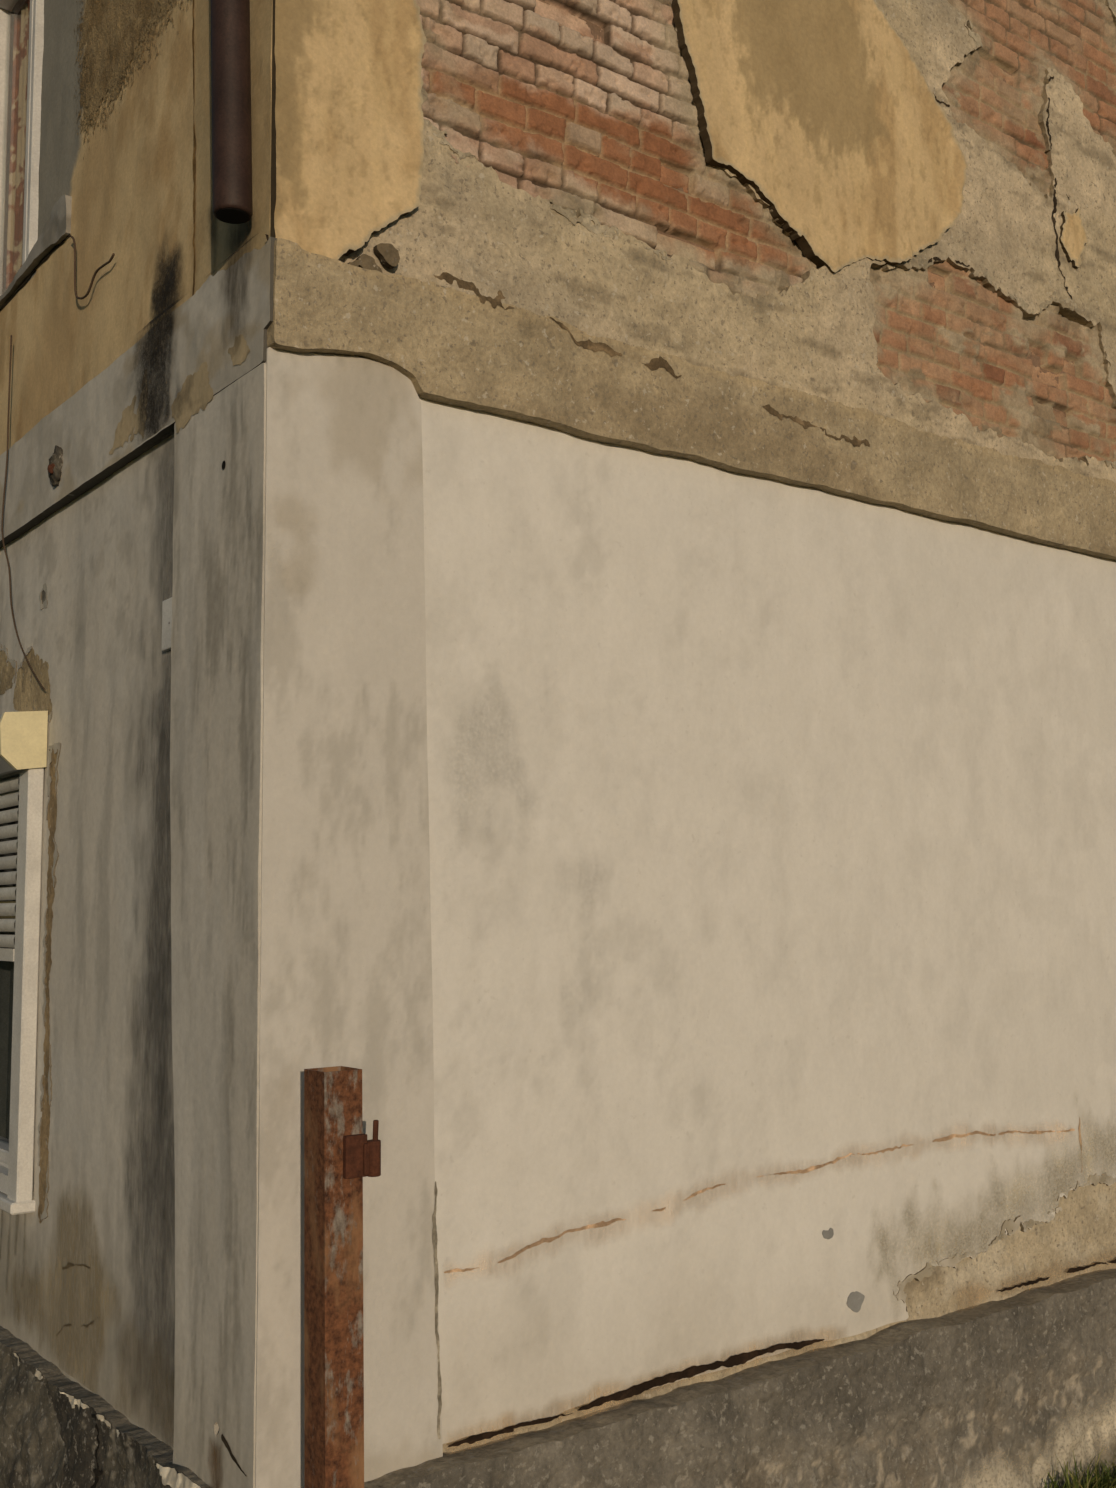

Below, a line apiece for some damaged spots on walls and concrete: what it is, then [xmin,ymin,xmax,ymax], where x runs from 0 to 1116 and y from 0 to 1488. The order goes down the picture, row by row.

flaking render [70,0,189,160]
leakage [151,249,180,351]
flaking render [270,0,1116,469]
peeling [0,644,52,722]
peeling [37,743,61,1223]
leakage [128,653,175,1421]
crack [432,1118,1082,1439]
peeling [893,1172,1116,1312]
spalling [59,1391,119,1437]
crack [90,1414,102,1488]
spalling [156,1463,201,1488]